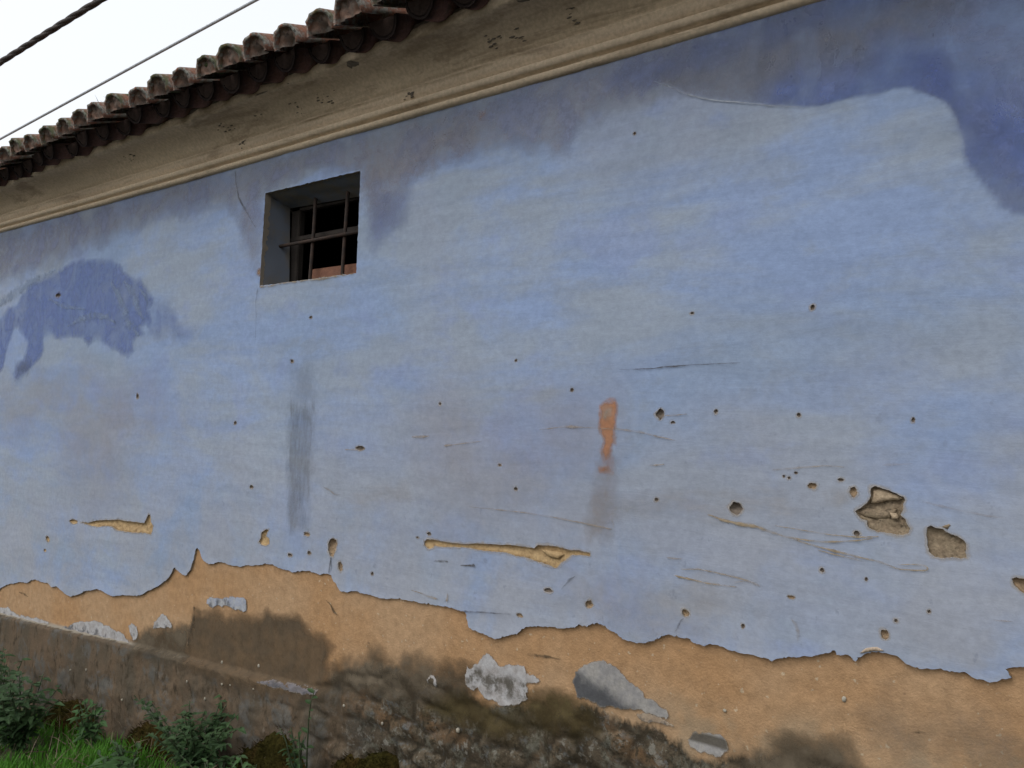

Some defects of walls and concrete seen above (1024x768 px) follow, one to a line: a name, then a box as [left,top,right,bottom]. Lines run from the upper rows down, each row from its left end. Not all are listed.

corrosion [599,402,616,471]
spalling [70,515,153,534]
spalling [327,538,343,571]
spalling [838,478,911,536]
spalling [925,524,968,559]
spalling [1012,577,1024,593]